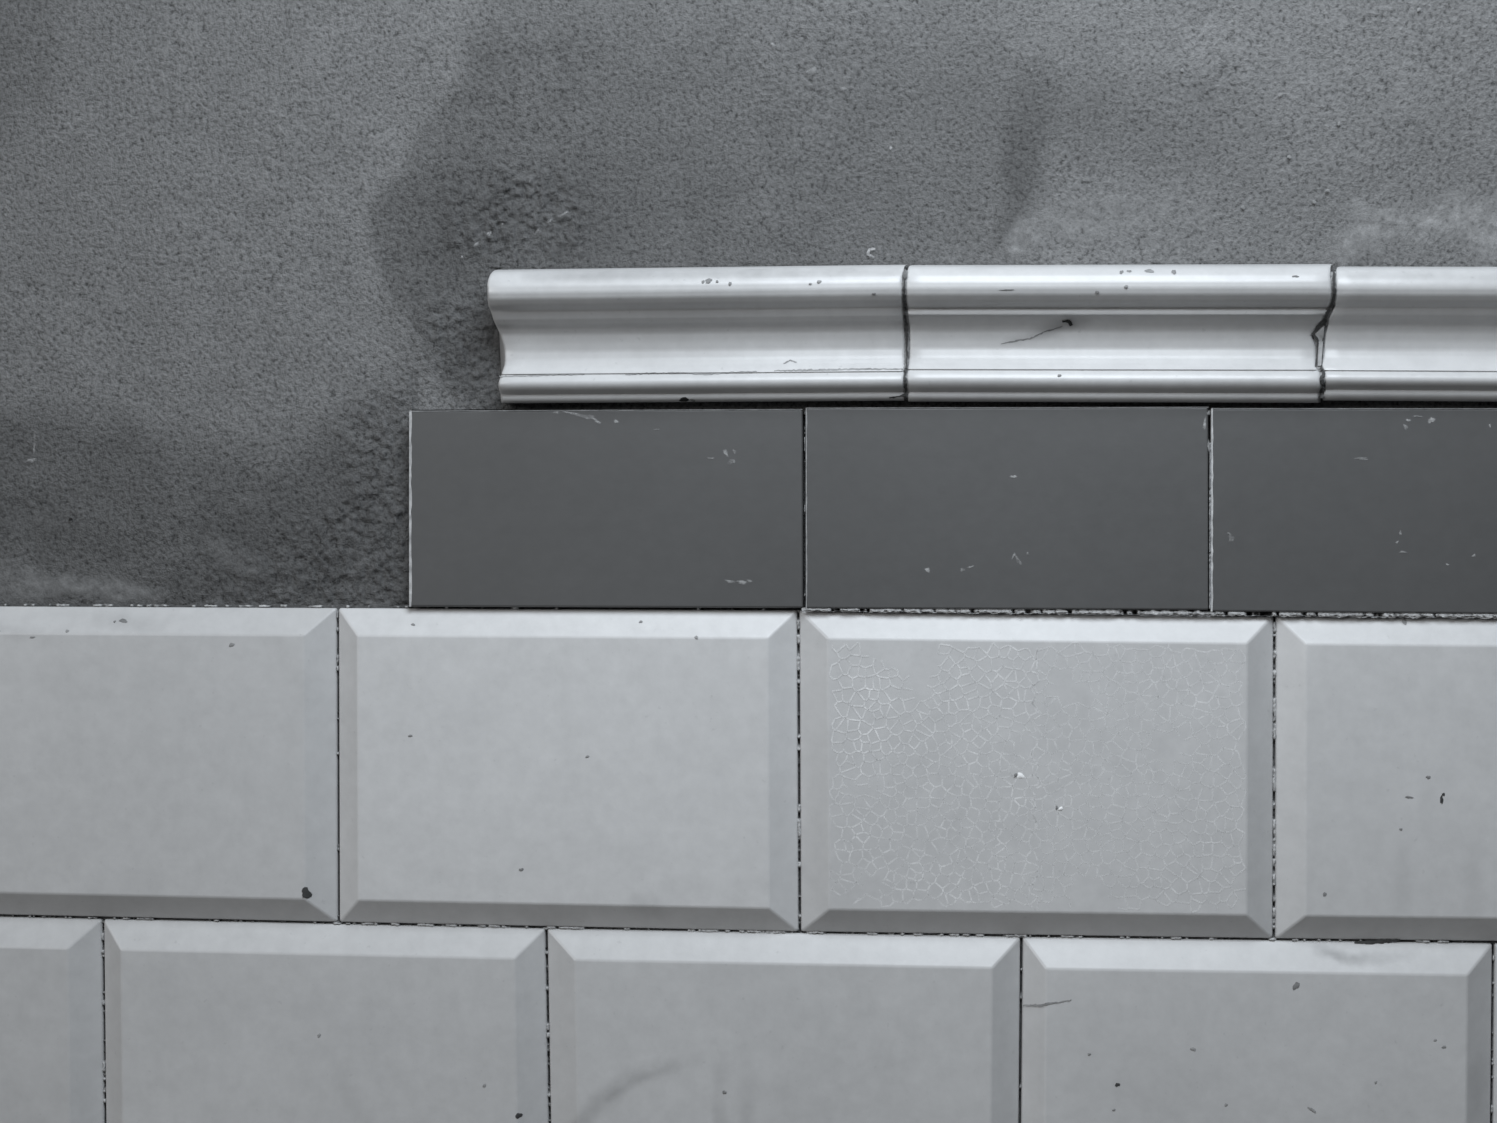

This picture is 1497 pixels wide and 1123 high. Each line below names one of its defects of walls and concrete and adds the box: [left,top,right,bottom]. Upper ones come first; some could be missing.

crack [1311,270,1336,398]